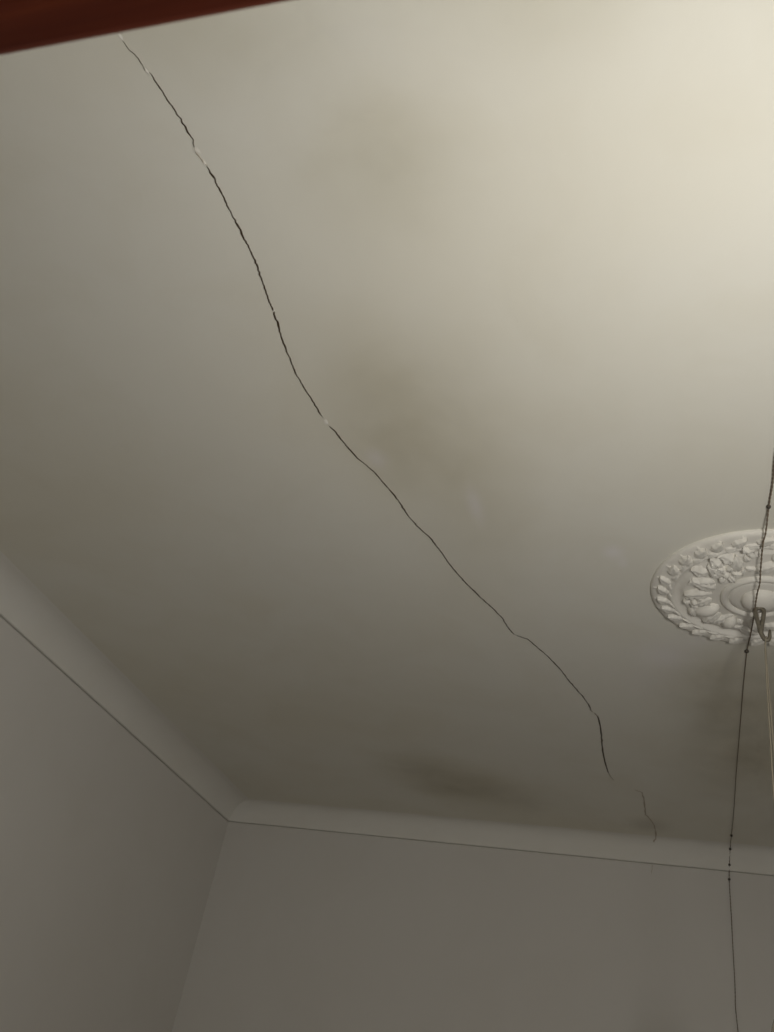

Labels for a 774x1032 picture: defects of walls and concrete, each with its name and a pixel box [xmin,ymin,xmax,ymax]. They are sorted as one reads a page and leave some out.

crack [117,33,613,779]